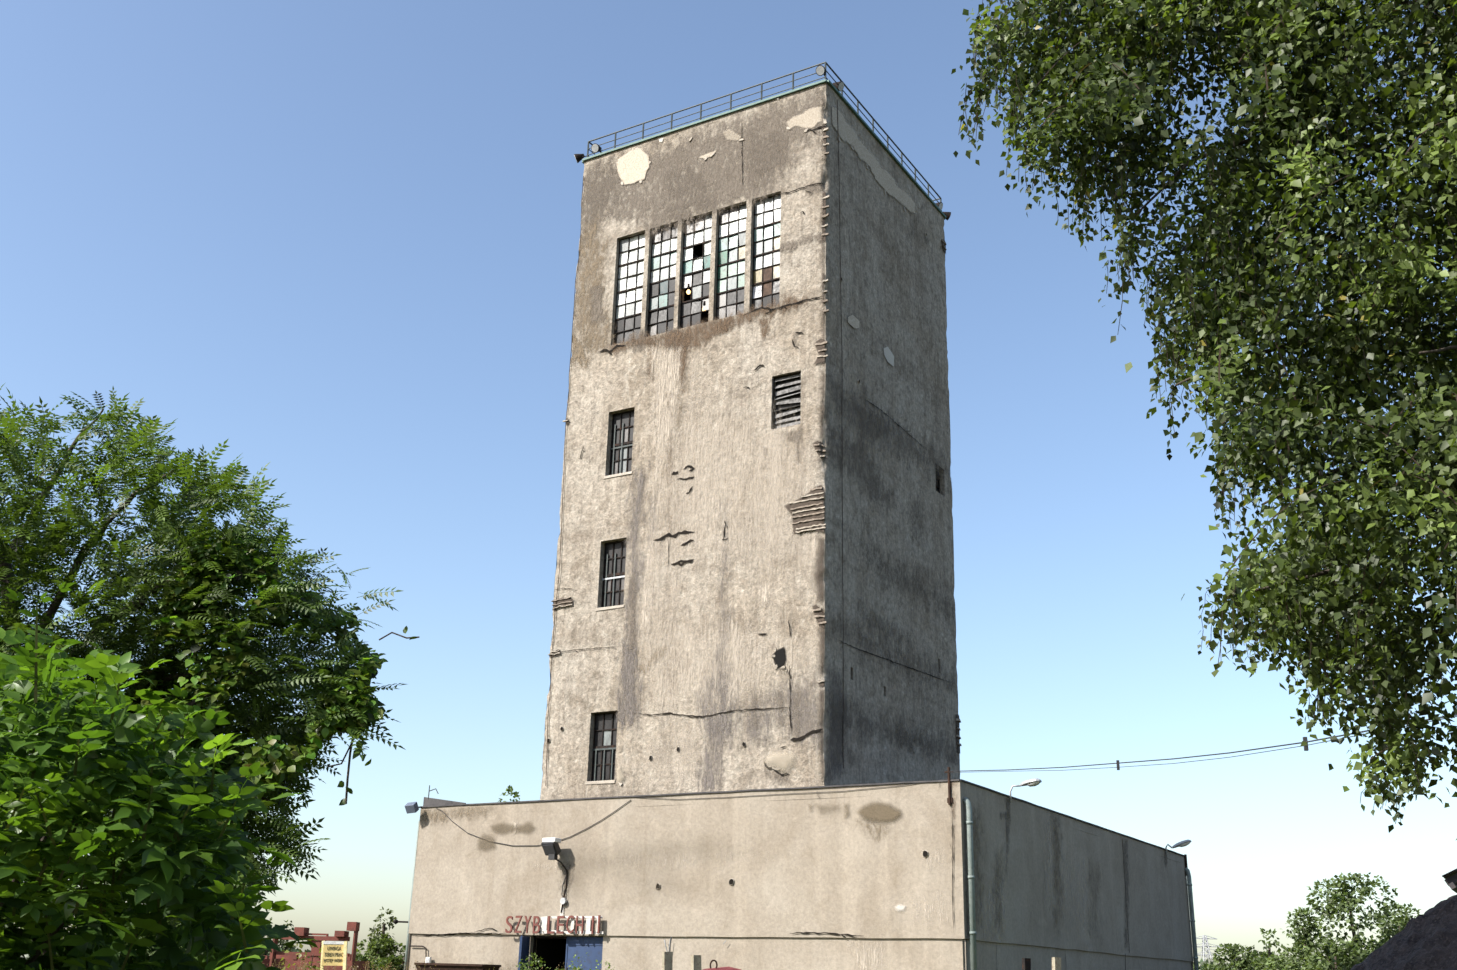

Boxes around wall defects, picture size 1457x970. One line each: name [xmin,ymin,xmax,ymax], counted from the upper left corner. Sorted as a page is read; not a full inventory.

spalling [616,138,663,185]
spalling [786,106,915,213]
spalling [785,485,827,534]
leakage [616,347,957,792]
spalling [771,647,786,670]
crack [639,620,823,748]
leakage [420,807,533,848]
leakage [845,803,900,839]
leakage [966,798,1010,936]